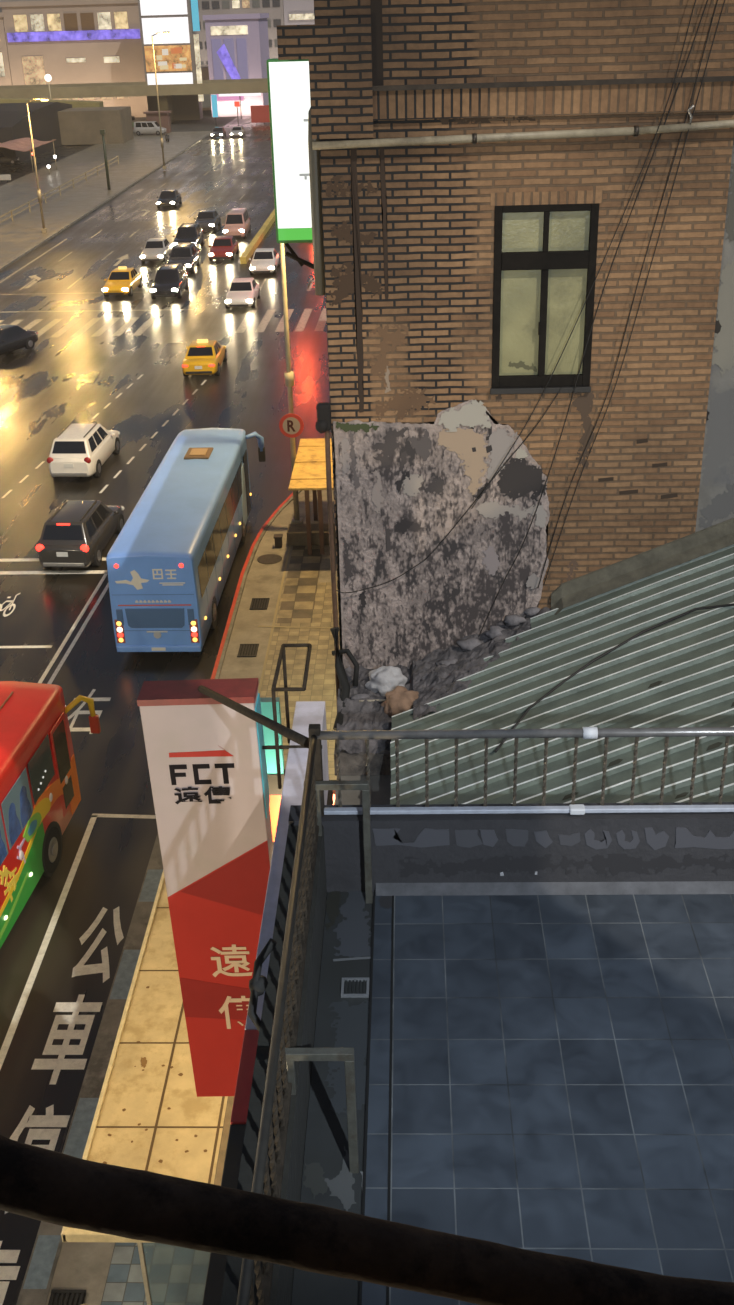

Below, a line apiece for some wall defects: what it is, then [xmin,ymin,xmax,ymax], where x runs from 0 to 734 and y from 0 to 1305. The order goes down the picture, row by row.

flaking render [402,474,424,497]
flaking render [438,426,547,528]
damp [699,383,734,528]
damp [338,426,547,669]
peeling [372,827,734,850]